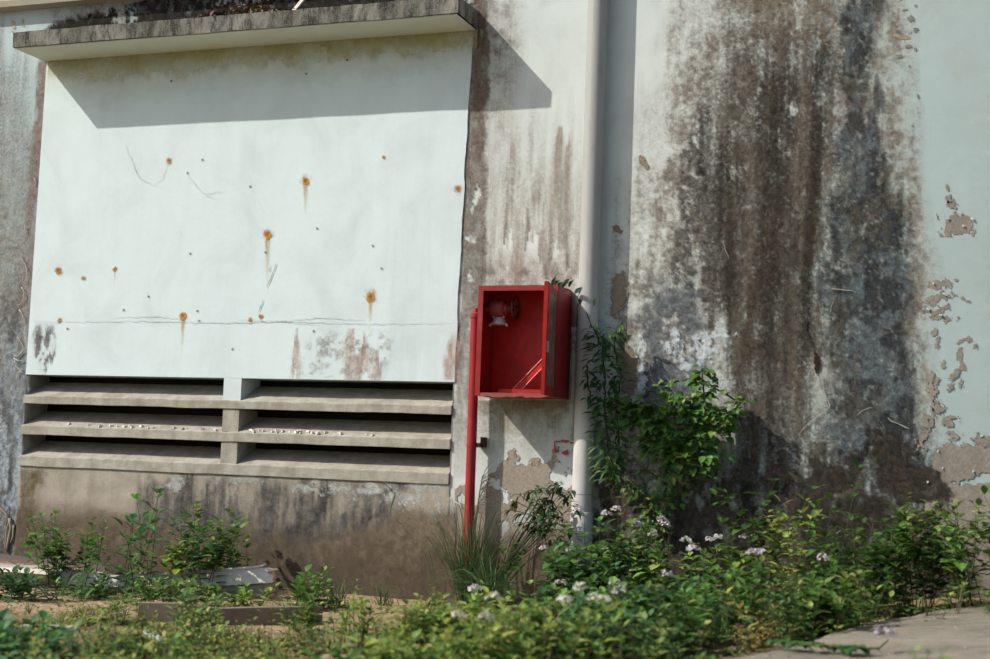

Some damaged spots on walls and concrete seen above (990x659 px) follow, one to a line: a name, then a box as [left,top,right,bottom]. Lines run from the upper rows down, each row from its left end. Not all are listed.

leakage [49,0,396,29]
leakage [394,0,580,402]
peeling [936,184,976,237]
leakage [0,60,55,526]
leakage [318,339,386,366]
peeling [610,271,628,319]
leakage [600,0,952,594]
peeling [921,278,971,349]
peeling [453,448,573,603]
peeling [914,336,990,565]